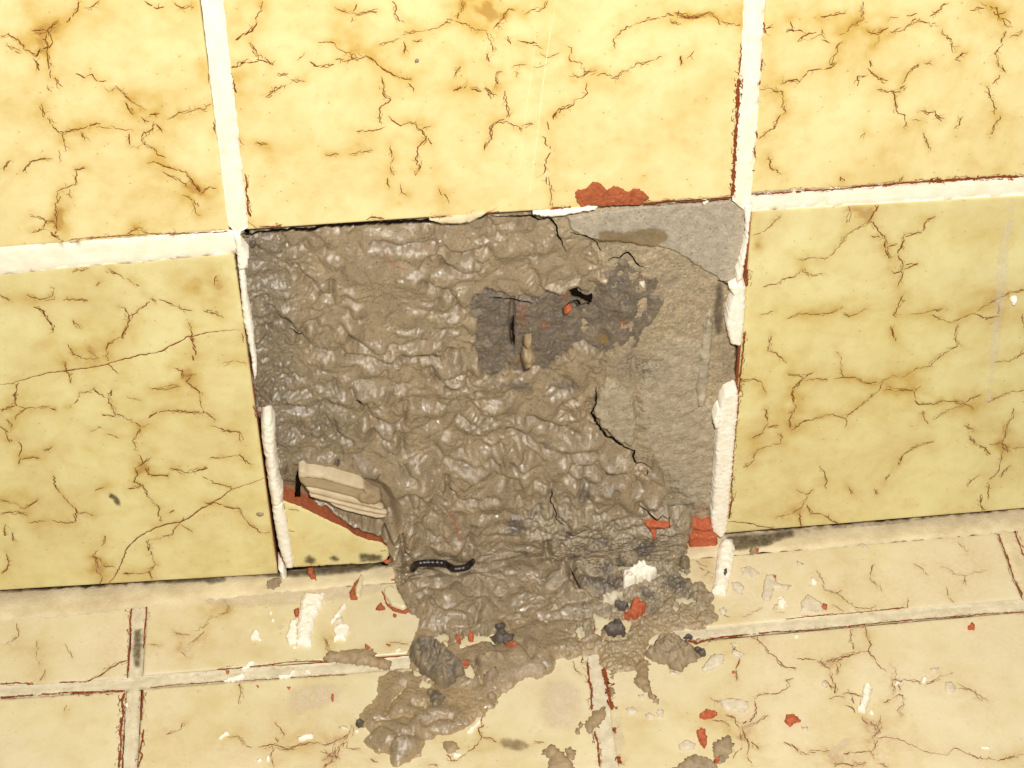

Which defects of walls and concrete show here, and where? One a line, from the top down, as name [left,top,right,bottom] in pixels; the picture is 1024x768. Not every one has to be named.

crack [571,232,643,267]
crack [1,329,236,385]
peeling [470,182,745,547]
crack [590,388,651,474]
crack [104,477,266,587]
spalling [283,486,390,581]
peeling [602,590,623,605]